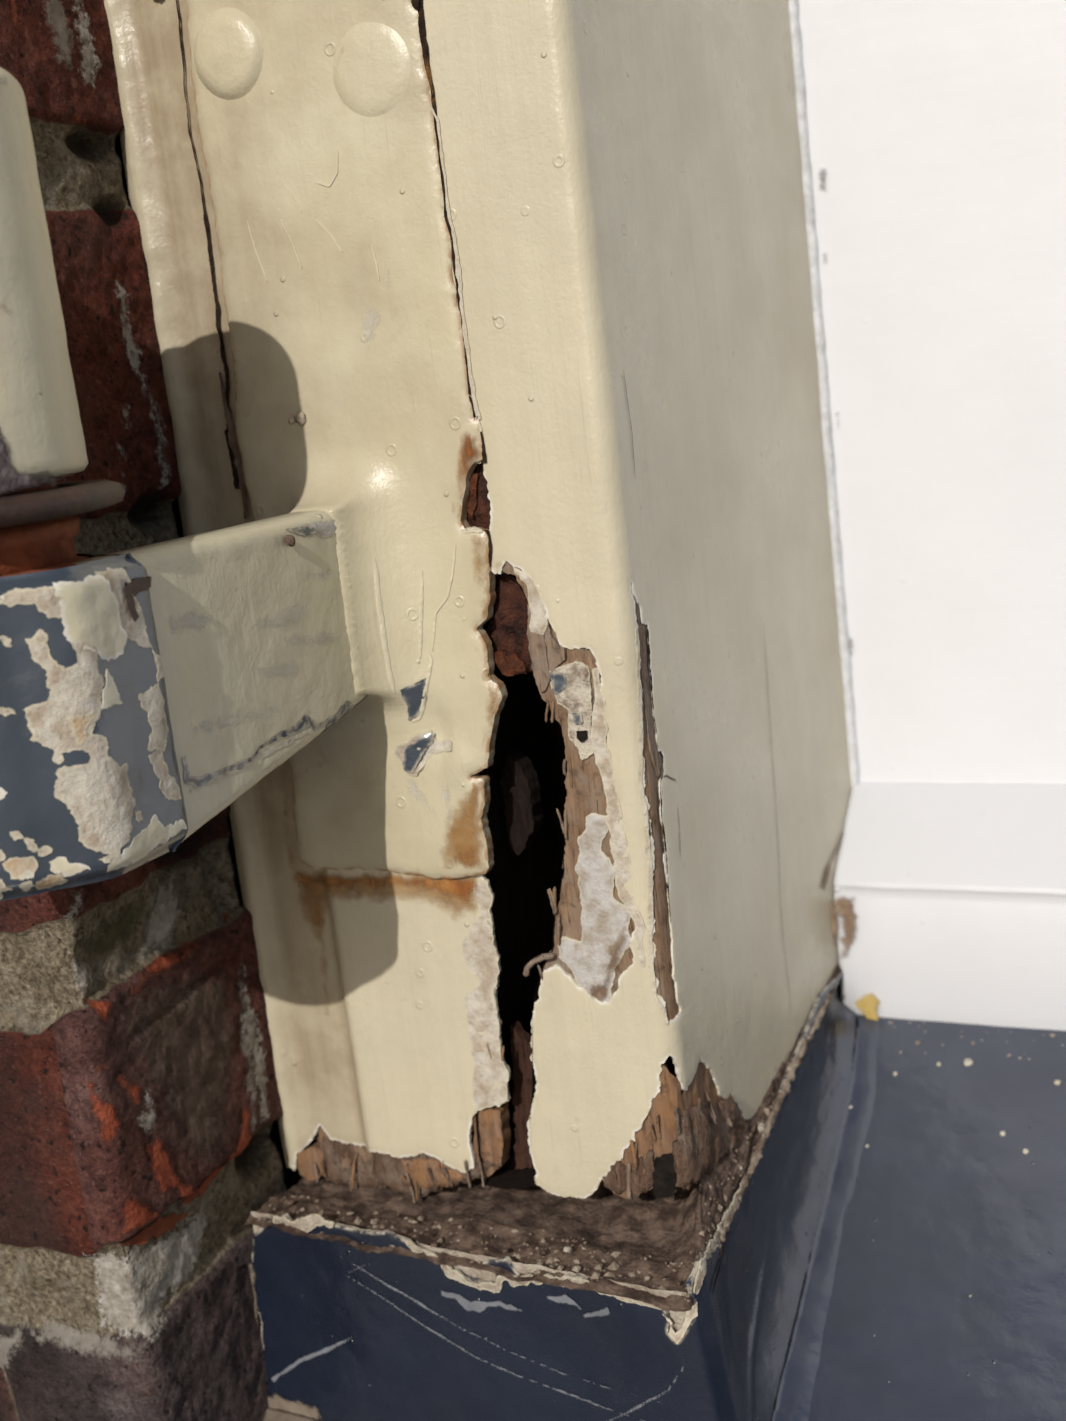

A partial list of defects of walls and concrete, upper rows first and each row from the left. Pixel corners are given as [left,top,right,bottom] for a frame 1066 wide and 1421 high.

crack [411,0,487,463]
peeling [0,433,66,493]
peeling [0,567,368,900]
peeling [374,544,456,797]
rust [460,437,474,474]
crack [484,530,492,567]
spalling [475,604,567,1189]
peeling [662,1302,698,1344]